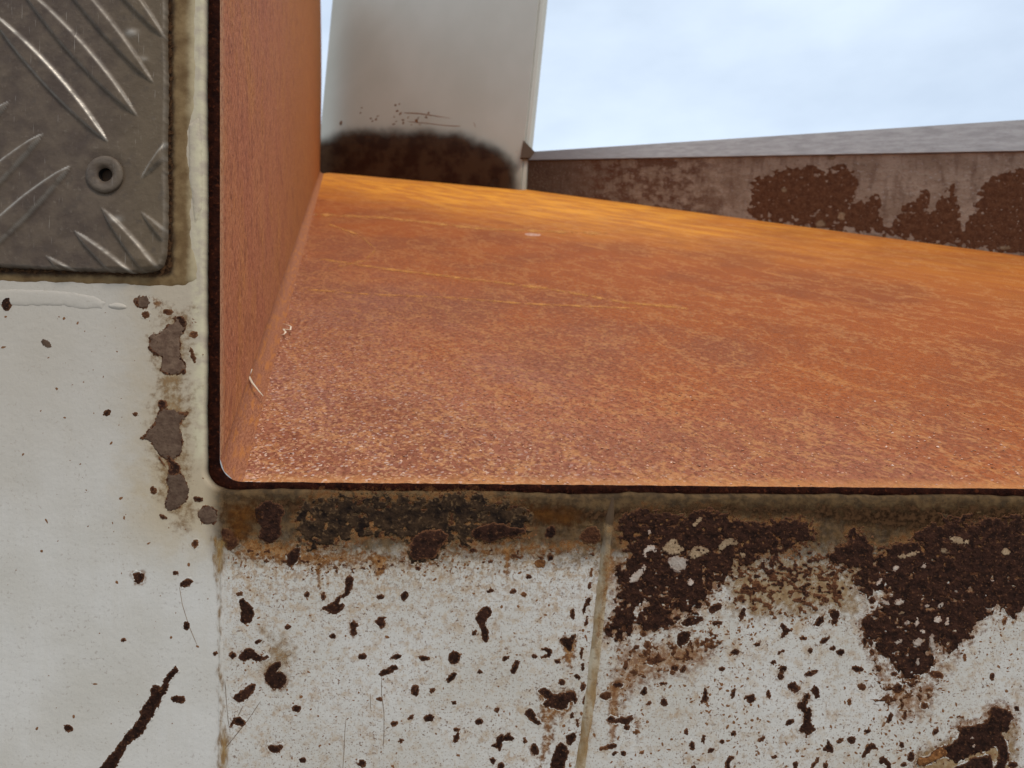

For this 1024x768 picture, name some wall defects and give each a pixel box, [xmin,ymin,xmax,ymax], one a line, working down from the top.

corrosion [747,155,1024,256]
peeling [133,295,198,376]
peeling [140,400,218,525]
corrosion [213,491,1024,768]